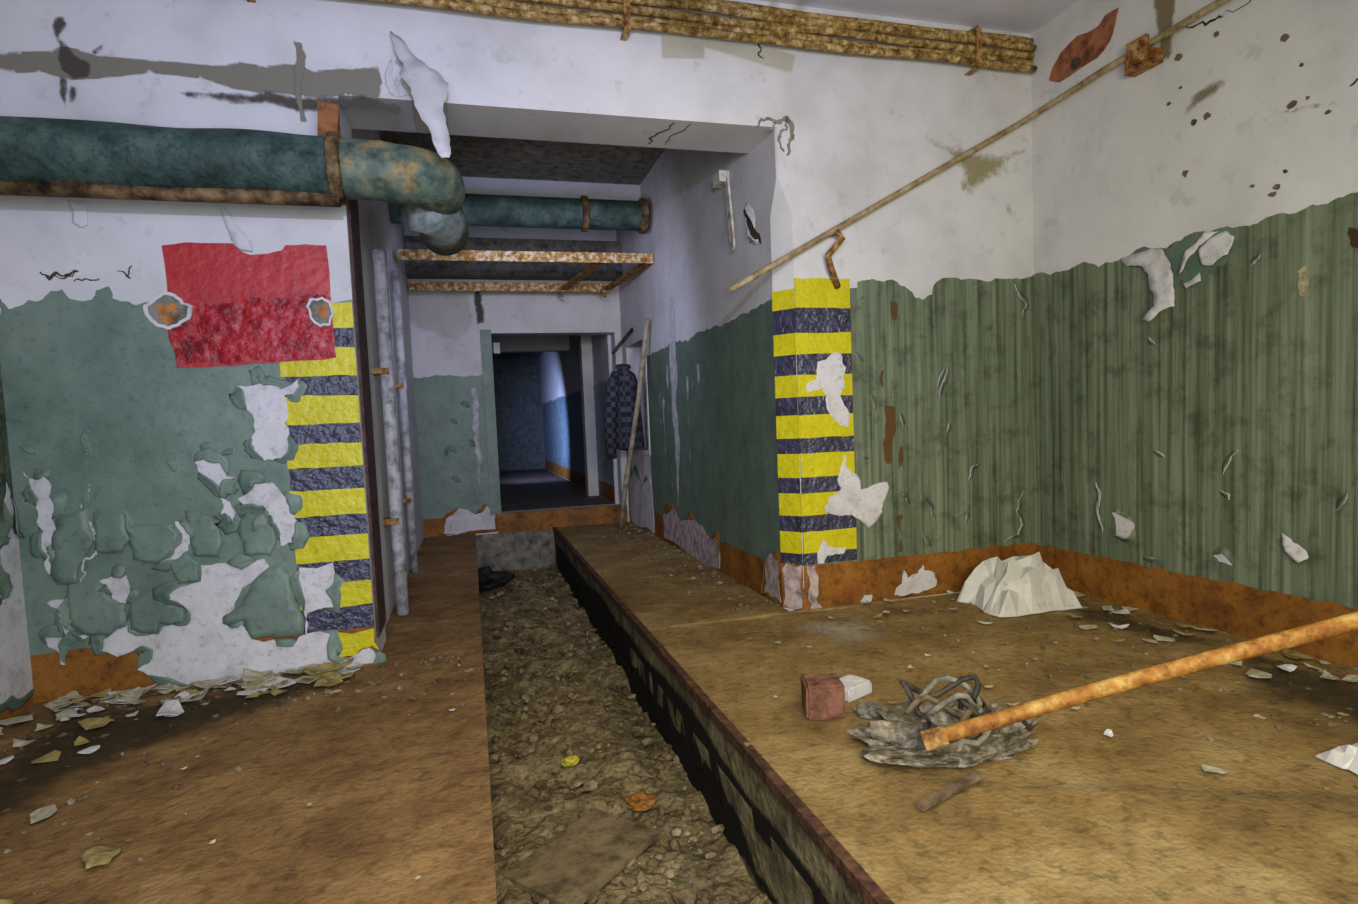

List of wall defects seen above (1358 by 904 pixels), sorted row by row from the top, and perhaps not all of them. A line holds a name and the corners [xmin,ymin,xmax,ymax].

leakage [0,17,400,122]
peeling [385,52,412,97]
flaking render [143,292,193,330]
flaking render [306,297,335,328]
peeling [1298,266,1309,298]
peeling [805,351,864,427]
peeling [194,365,310,551]
peeling [0,469,387,714]
peeling [761,539,846,610]